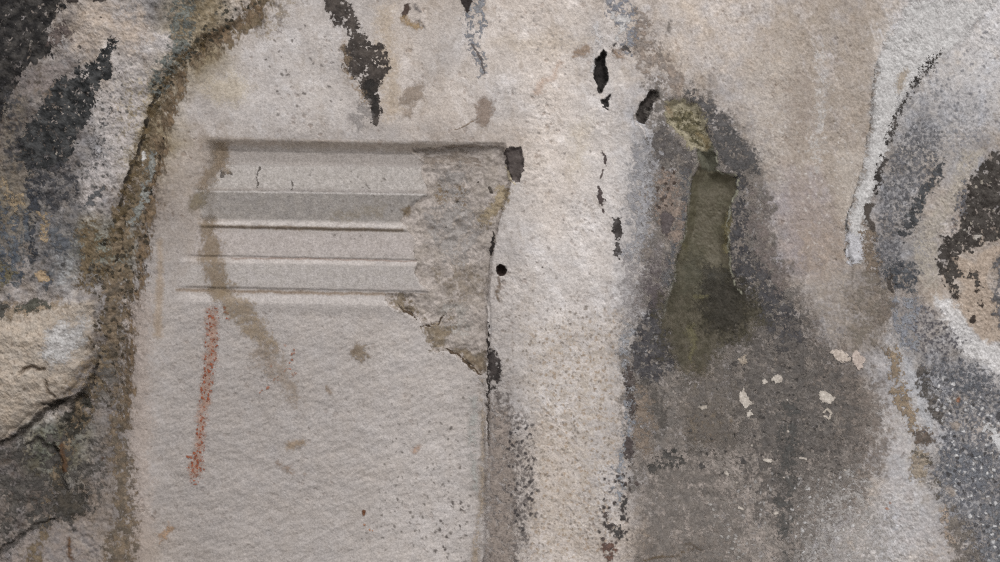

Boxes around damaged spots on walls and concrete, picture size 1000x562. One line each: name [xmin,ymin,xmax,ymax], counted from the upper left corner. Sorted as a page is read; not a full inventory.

leakage [0,0,278,562]
leakage [325,0,392,130]
spalling [385,145,524,375]
leakage [597,0,1000,562]